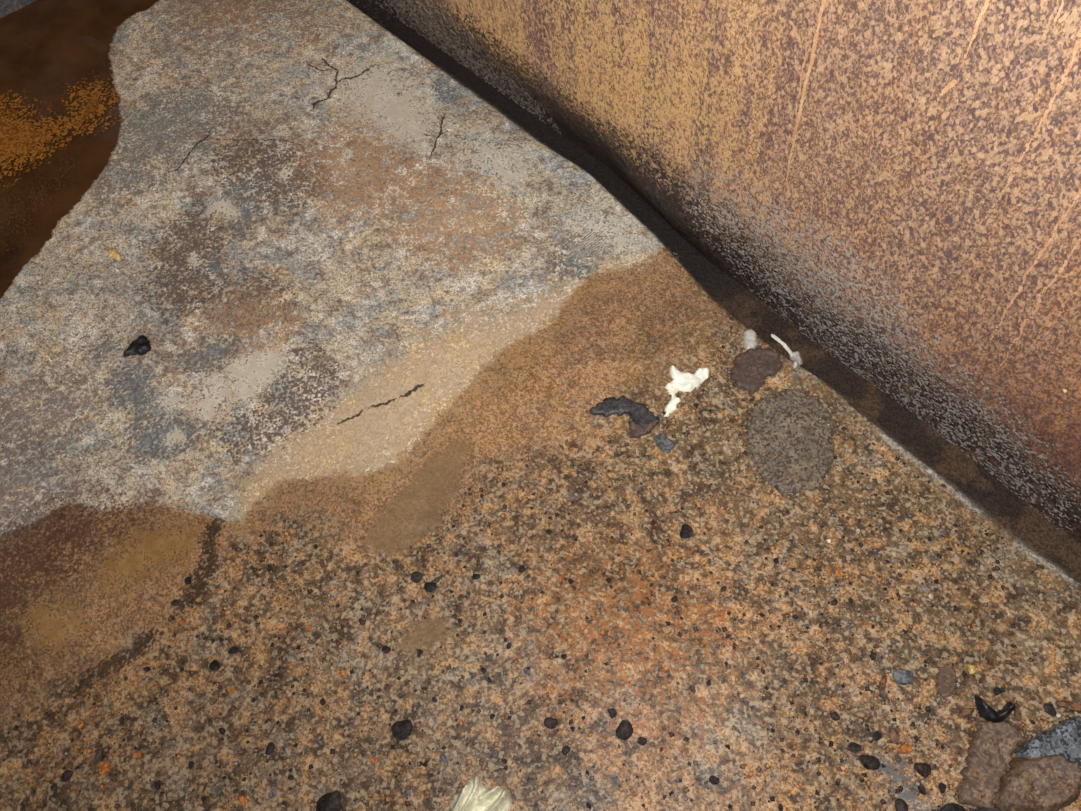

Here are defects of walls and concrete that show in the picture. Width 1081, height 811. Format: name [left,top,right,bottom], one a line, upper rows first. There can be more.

corrosion [0,0,384,190]
crack [429,113,448,158]
corrosion [543,0,746,173]
corrosion [784,0,826,192]
corrosion [961,0,990,66]
corrosion [970,26,1081,239]
damp [373,0,1081,543]
corrosion [986,187,1081,372]
crack [337,384,424,424]
damp [209,232,677,546]
damp [0,482,151,693]
damp [872,744,942,811]